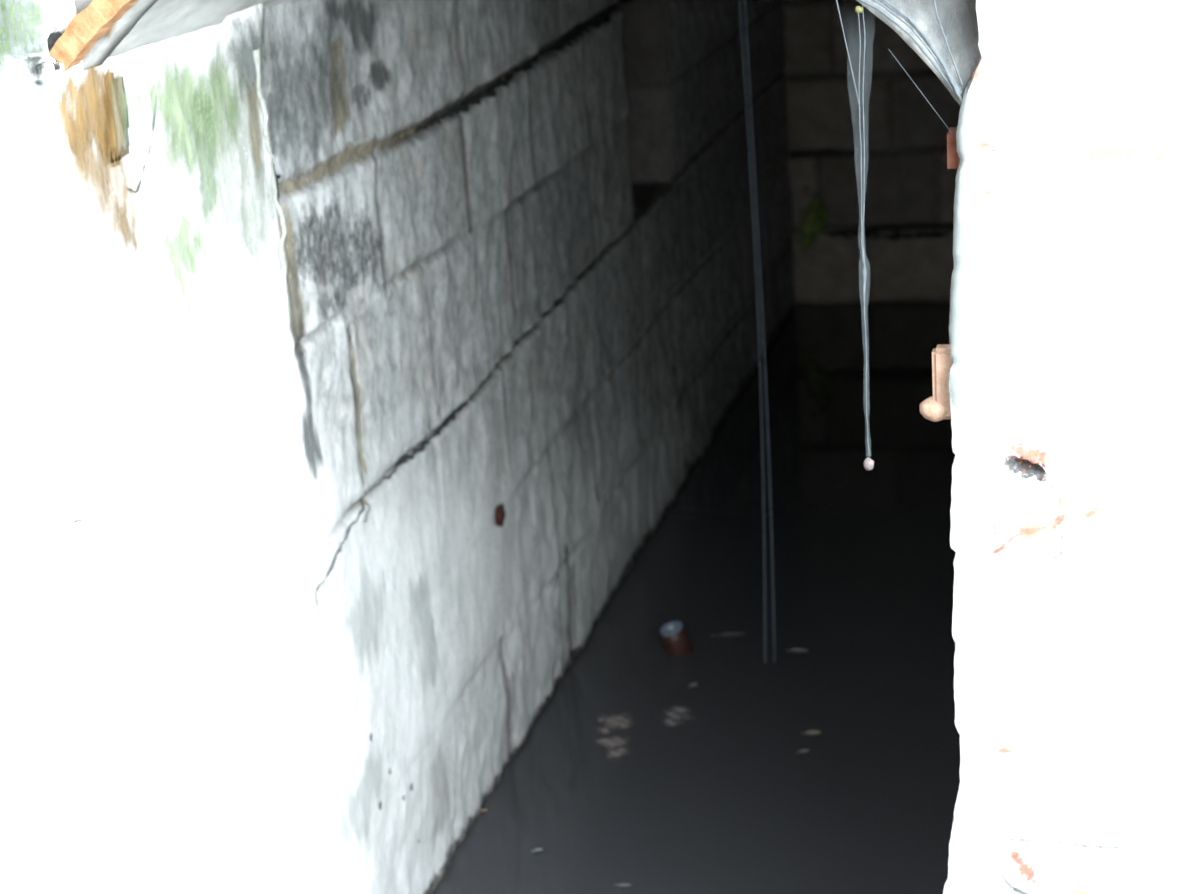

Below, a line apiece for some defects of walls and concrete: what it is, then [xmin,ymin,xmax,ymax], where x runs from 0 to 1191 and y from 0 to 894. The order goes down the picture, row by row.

corrosion [49,0,140,265]
leakage [146,94,217,318]
leakage [235,0,414,195]
leakage [280,203,383,475]
crack [316,233,625,617]
spalling [993,439,1068,559]